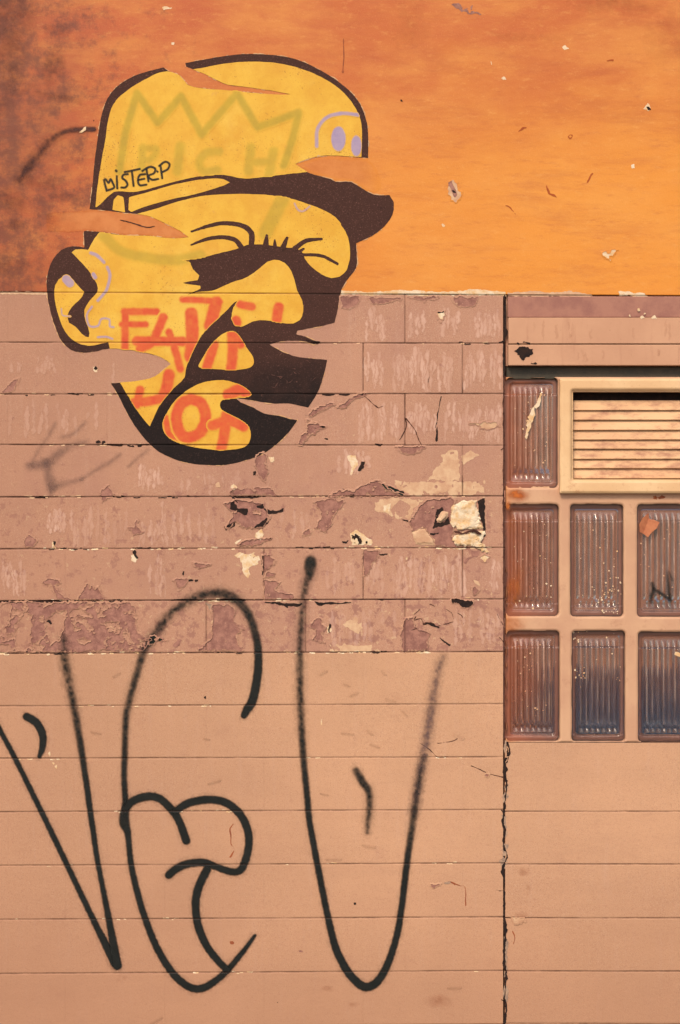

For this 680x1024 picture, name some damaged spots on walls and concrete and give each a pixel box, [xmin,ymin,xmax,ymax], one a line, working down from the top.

peeling [515,341,537,364]
peeling [99,484,121,503]
spalling [215,451,492,602]
peeling [172,547,218,591]
peeling [0,577,185,656]
peeling [197,598,245,653]
peeling [286,617,381,654]
peeling [395,616,451,654]
peeling [450,580,481,610]
crack [459,295,515,1024]